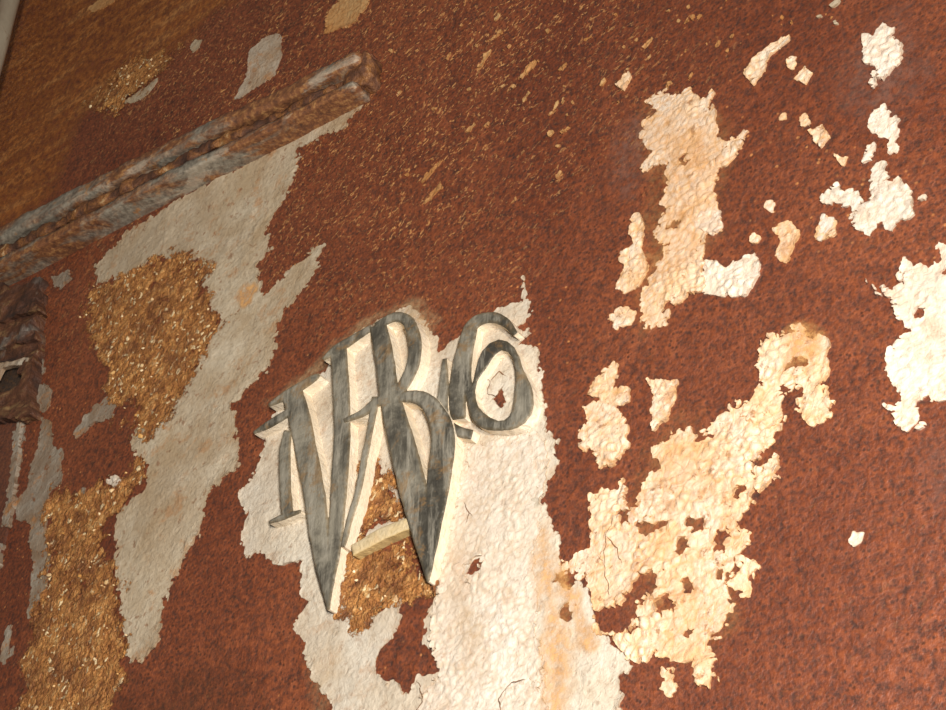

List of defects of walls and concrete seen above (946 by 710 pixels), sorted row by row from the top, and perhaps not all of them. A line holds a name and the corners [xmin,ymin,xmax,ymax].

rust [0,0,223,223]
rust [0,84,337,258]
peeling [608,72,761,330]
peeling [743,15,813,86]
peeling [764,200,801,264]
peeling [814,103,927,242]
peeling [861,22,904,89]
rust [7,244,257,710]
peeling [94,105,363,664]
rust [332,455,439,637]
peeling [238,275,836,710]
peeling [865,242,946,432]